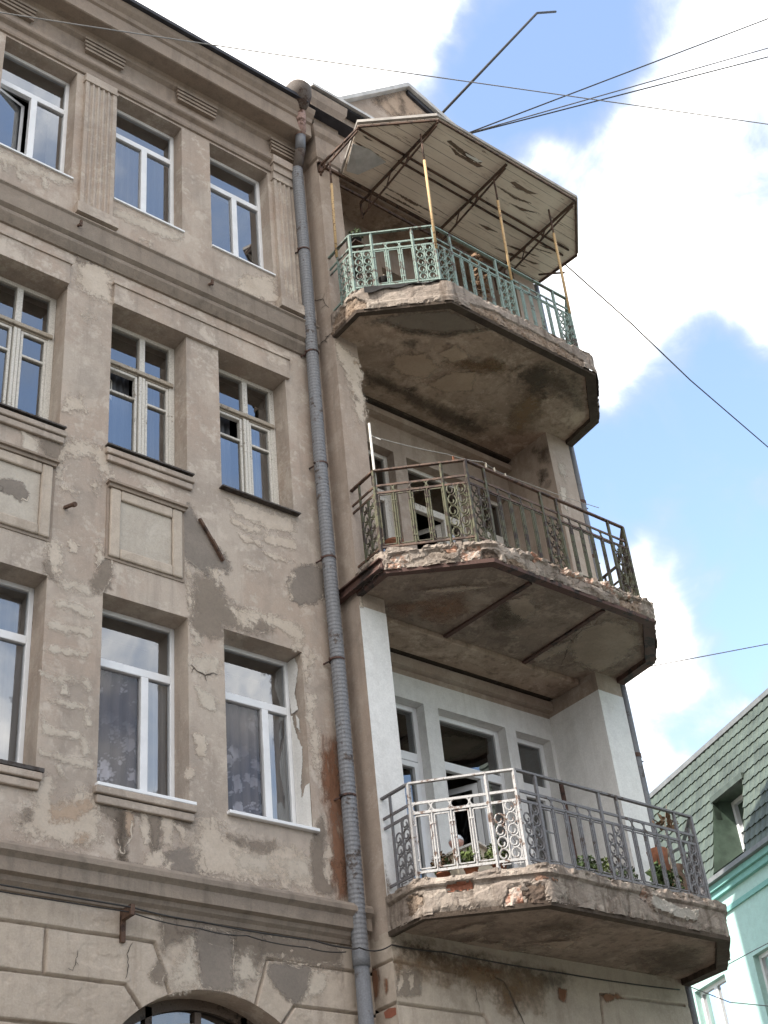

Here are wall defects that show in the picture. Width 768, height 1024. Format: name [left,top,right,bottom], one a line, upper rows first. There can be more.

peeling [331,298,368,424]
spalling [376,302,583,366]
water stain [370,376,481,432]
spalling [0,478,30,502]
spalling [385,553,411,570]
peeling [440,546,640,672]
peeling [163,498,336,894]
rust [322,738,348,898]
spalling [446,880,473,893]
spalling [504,875,558,906]